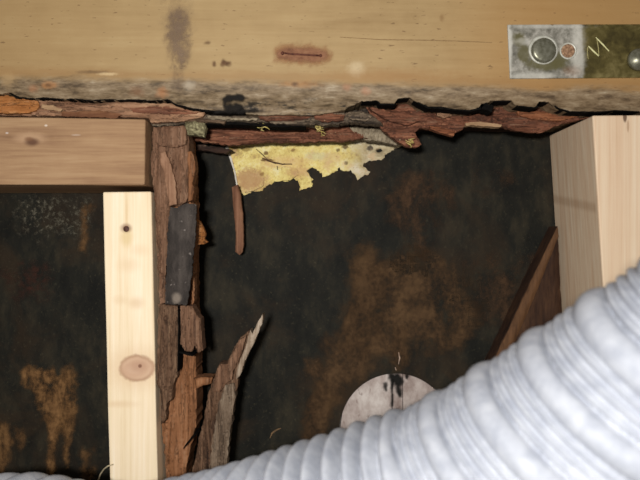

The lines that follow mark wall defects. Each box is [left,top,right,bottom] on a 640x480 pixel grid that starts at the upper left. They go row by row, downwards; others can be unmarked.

rust [276,46,329,62]
spalling [214,94,258,114]
peeling [226,140,402,195]
leakage [305,176,475,440]
crack [177,304,197,372]
peeling [194,335,247,392]
crack [183,426,202,449]